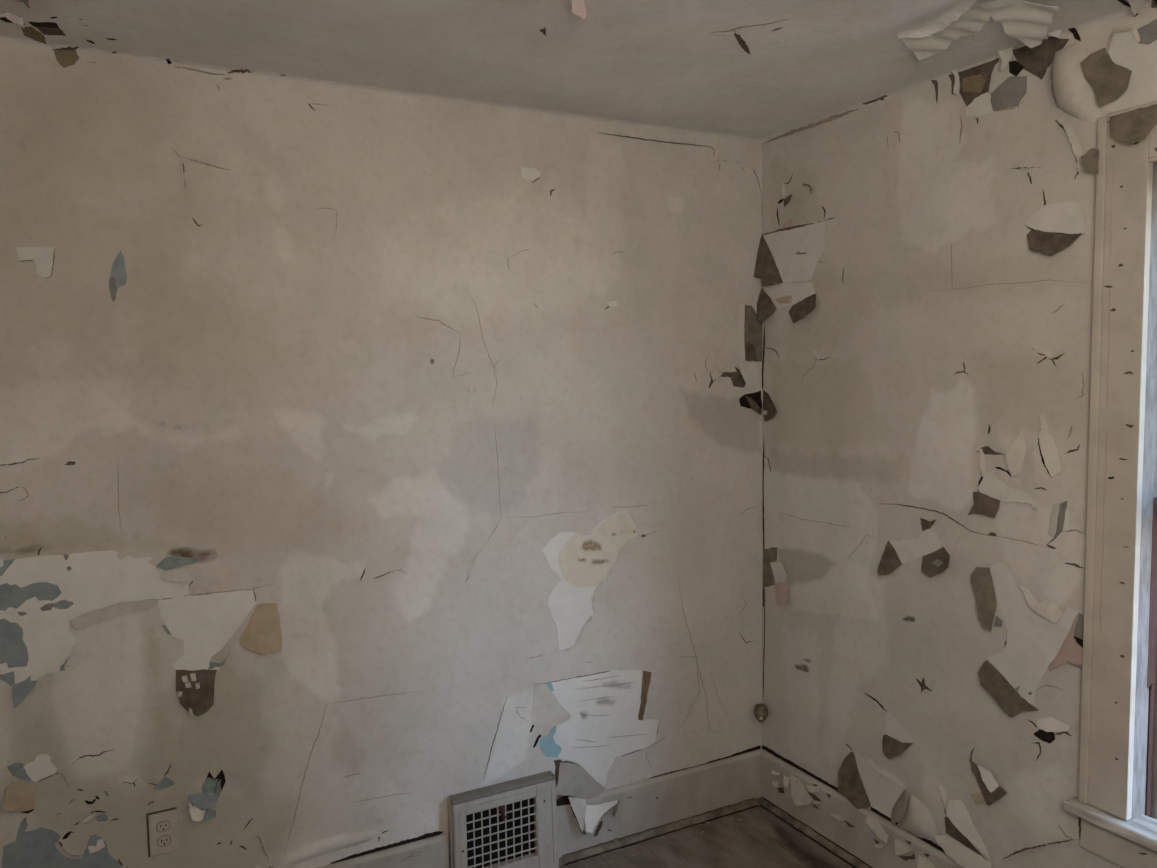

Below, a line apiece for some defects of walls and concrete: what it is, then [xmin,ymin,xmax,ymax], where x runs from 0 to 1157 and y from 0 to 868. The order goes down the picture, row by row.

peeling [901,0,1081,144]
peeling [1077,0,1157,145]
peeling [754,218,834,324]
crack [416,299,498,399]
peeling [694,357,777,422]
peeling [877,518,950,577]
peeling [0,550,282,717]
peeling [971,563,1092,761]
peeling [1,749,128,868]
crack [283,691,415,857]
peeling [530,669,666,837]
peeling [771,693,1007,868]